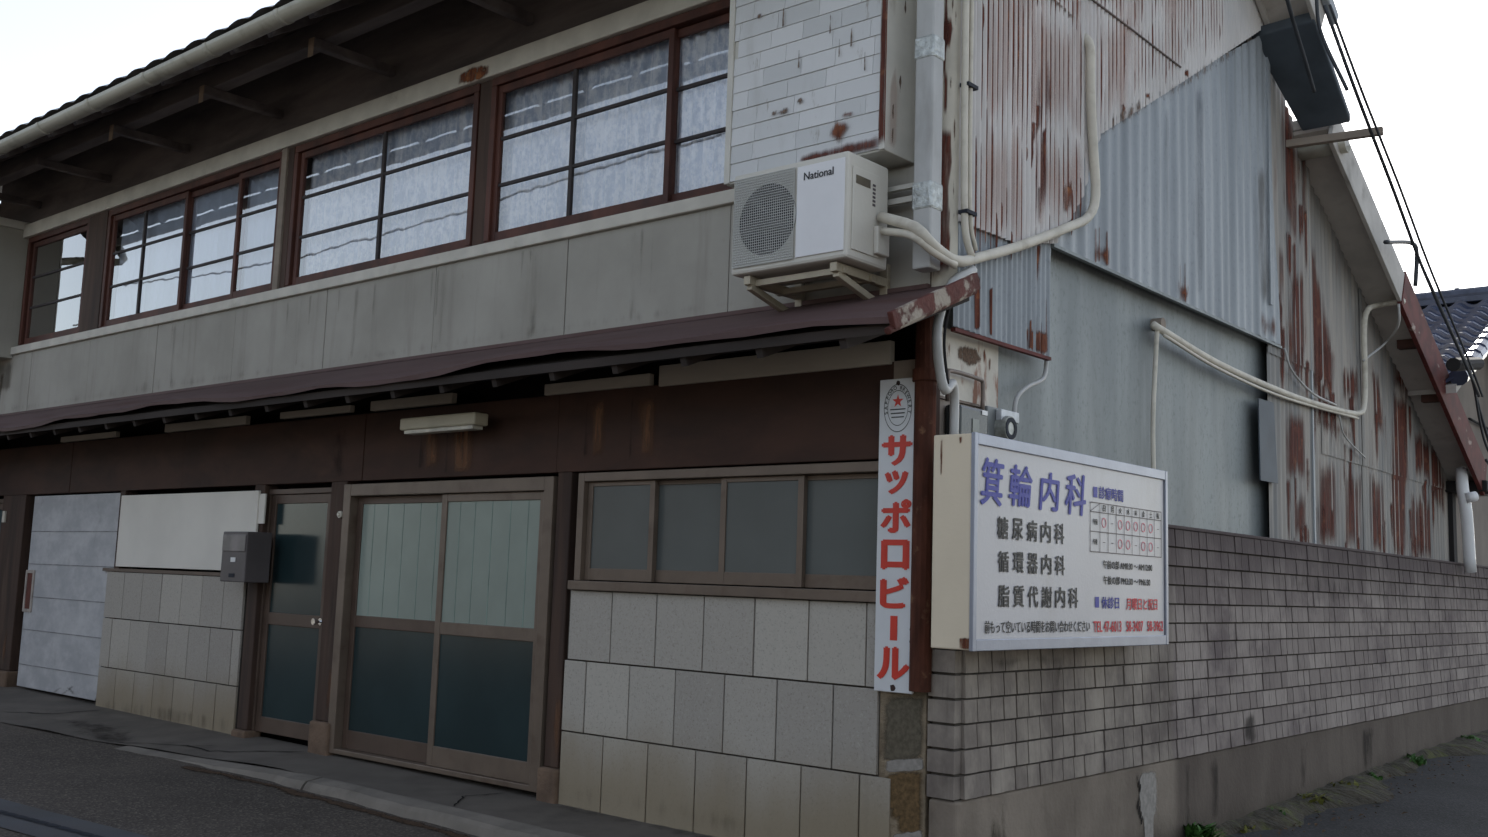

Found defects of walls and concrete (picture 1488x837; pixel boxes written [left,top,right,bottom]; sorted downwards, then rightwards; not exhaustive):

corrosion [940,0,955,268]
corrosion [974,0,1082,335]
corrosion [1095,228,1109,265]
corrosion [1101,0,1223,120]
corrosion [1262,107,1444,557]